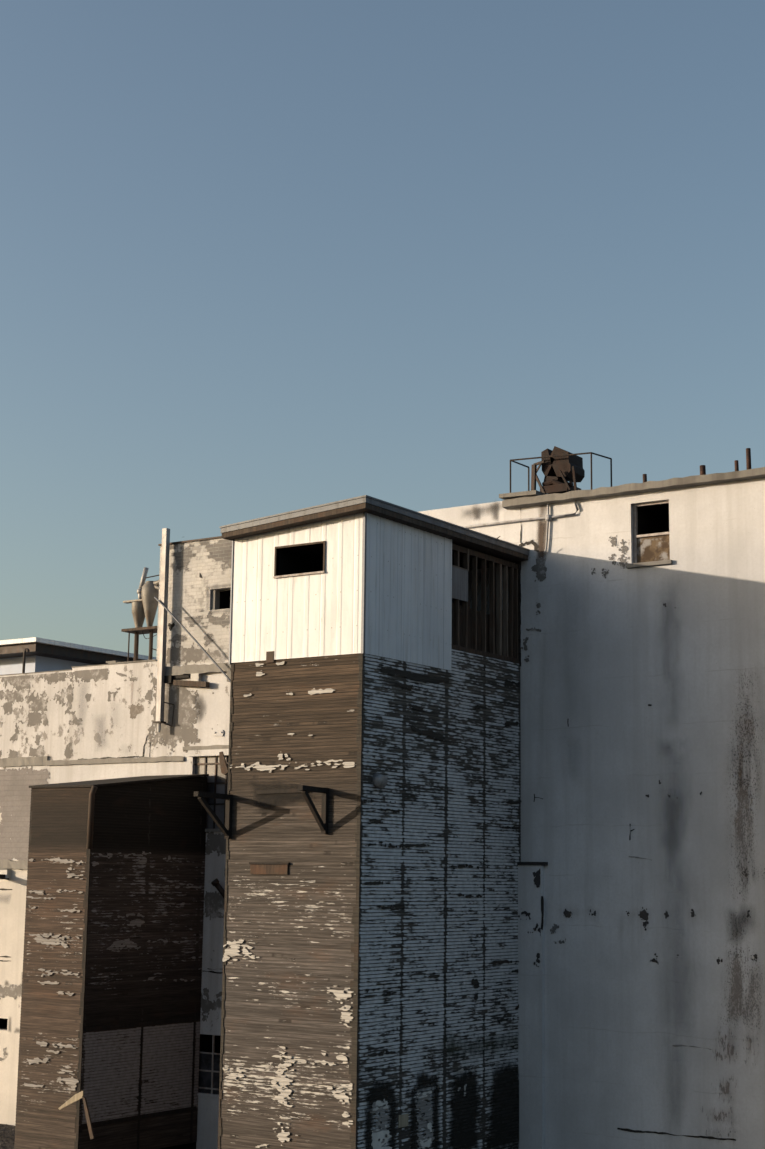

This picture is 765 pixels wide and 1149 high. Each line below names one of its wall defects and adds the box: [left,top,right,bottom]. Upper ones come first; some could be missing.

peeling [170,539,232,571]
peeling [591,535,630,579]
flaking render [166,611,230,666]
flaking render [0,668,214,871]
peeling [363,799,403,824]
peeling [518,909,572,944]
spalling [626,907,649,931]
peeling [370,1099,392,1149]
peeling [413,1086,435,1149]